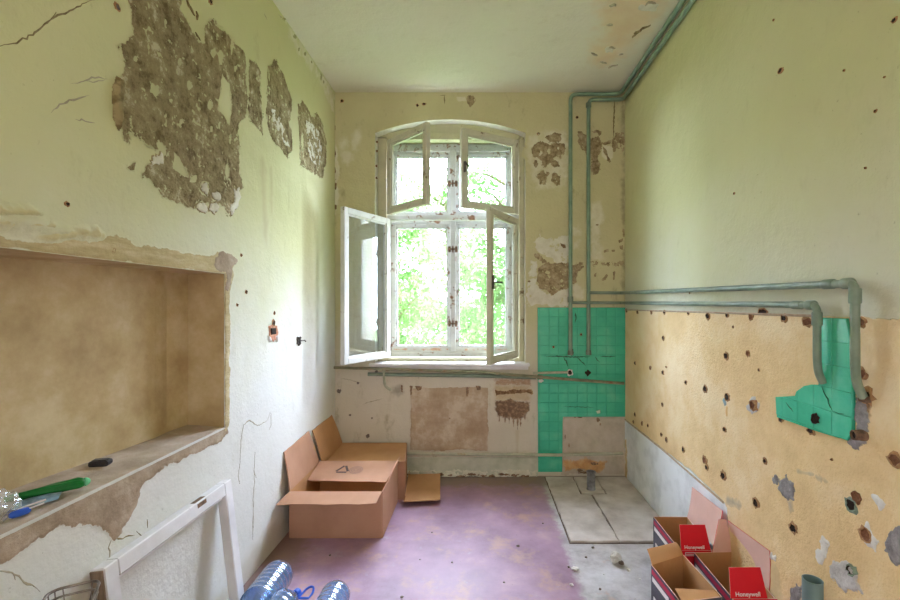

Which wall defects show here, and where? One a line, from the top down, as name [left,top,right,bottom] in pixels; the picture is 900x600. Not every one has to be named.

crack [1,0,91,46]
crack [51,76,104,123]
spalling [112,0,342,222]
peeling [520,124,625,196]
peeling [525,198,625,308]
crack [238,414,271,539]